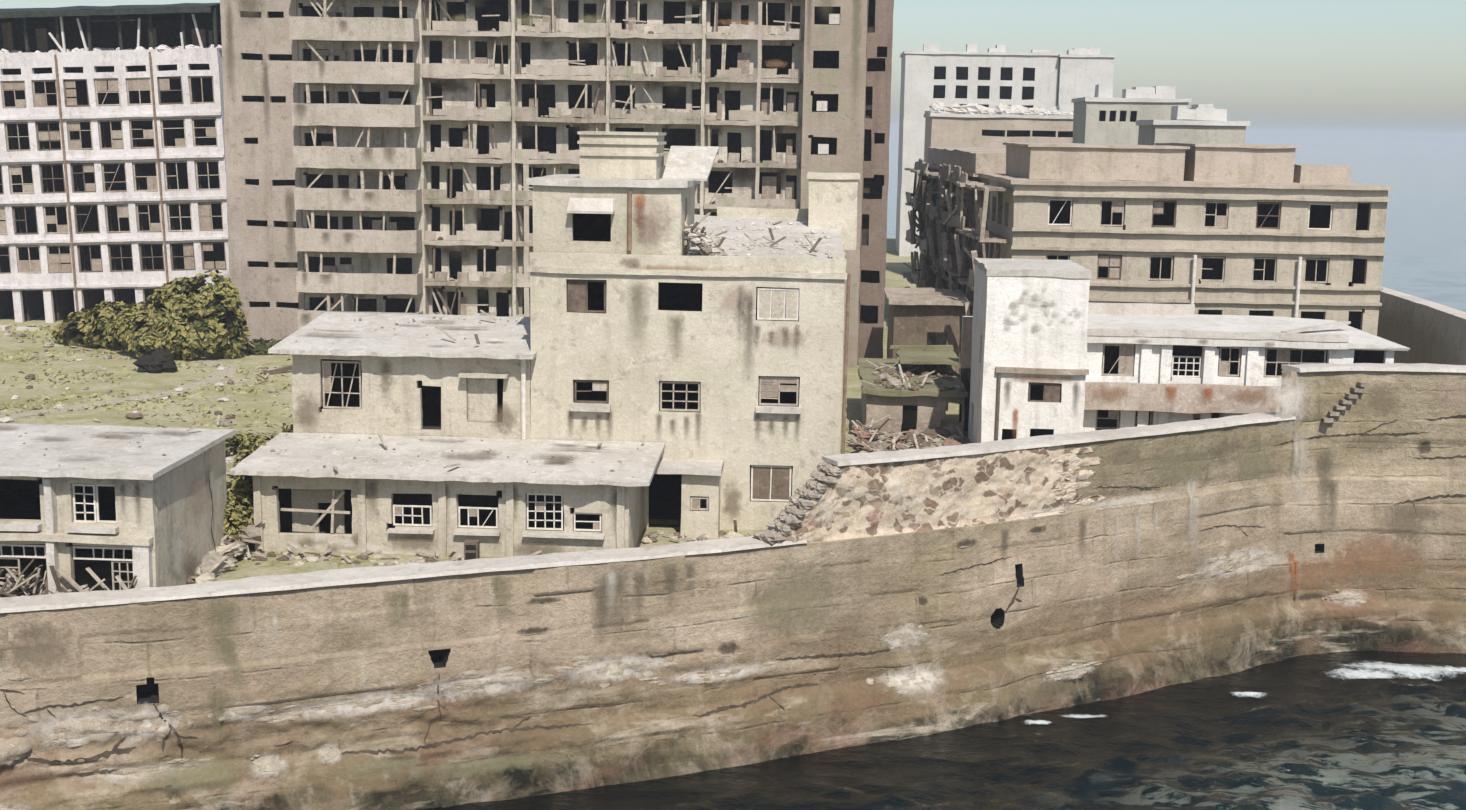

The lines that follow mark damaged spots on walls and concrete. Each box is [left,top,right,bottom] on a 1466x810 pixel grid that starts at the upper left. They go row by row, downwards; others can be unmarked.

damp [739,289,799,337]
crack [1274,415,1466,459]
spalling [753,462,843,546]
crack [1396,494,1466,511]
crack [0,689,197,765]
crack [337,675,591,755]